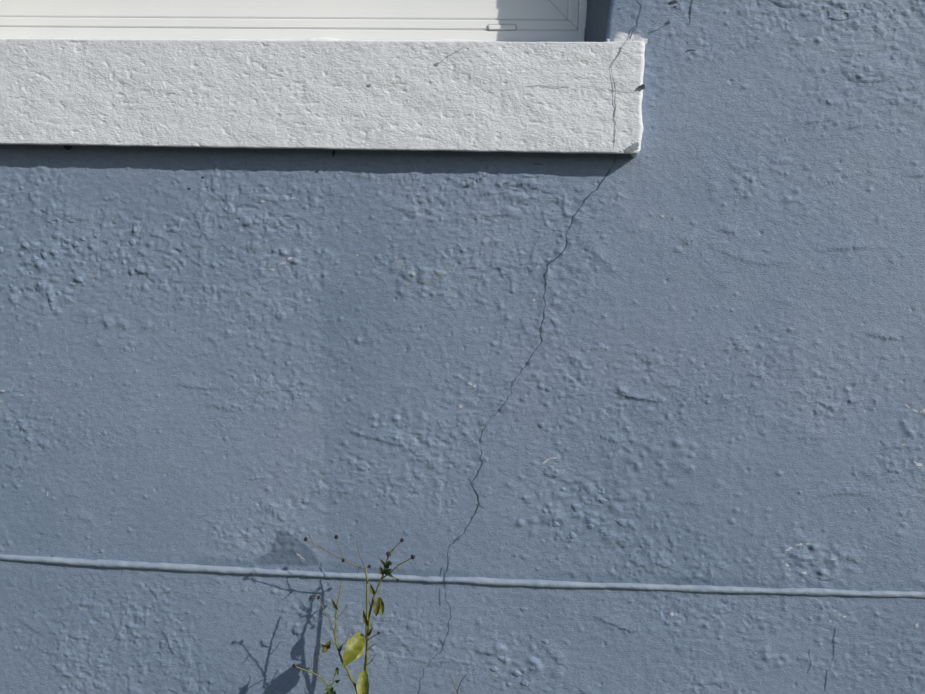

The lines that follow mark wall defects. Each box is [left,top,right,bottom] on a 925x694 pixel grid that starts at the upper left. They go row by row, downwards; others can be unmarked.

crack [418,0,642,694]